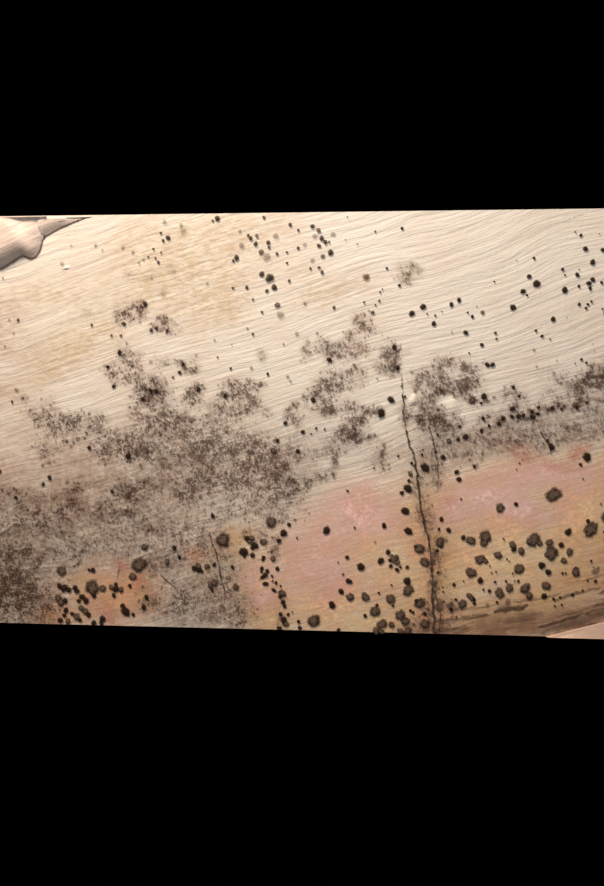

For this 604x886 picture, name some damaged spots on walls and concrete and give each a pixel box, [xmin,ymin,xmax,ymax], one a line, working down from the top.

leakage [44,230,300,374]
leakage [561,268,604,314]
leakage [0,288,604,636]
crack [401,375,441,633]